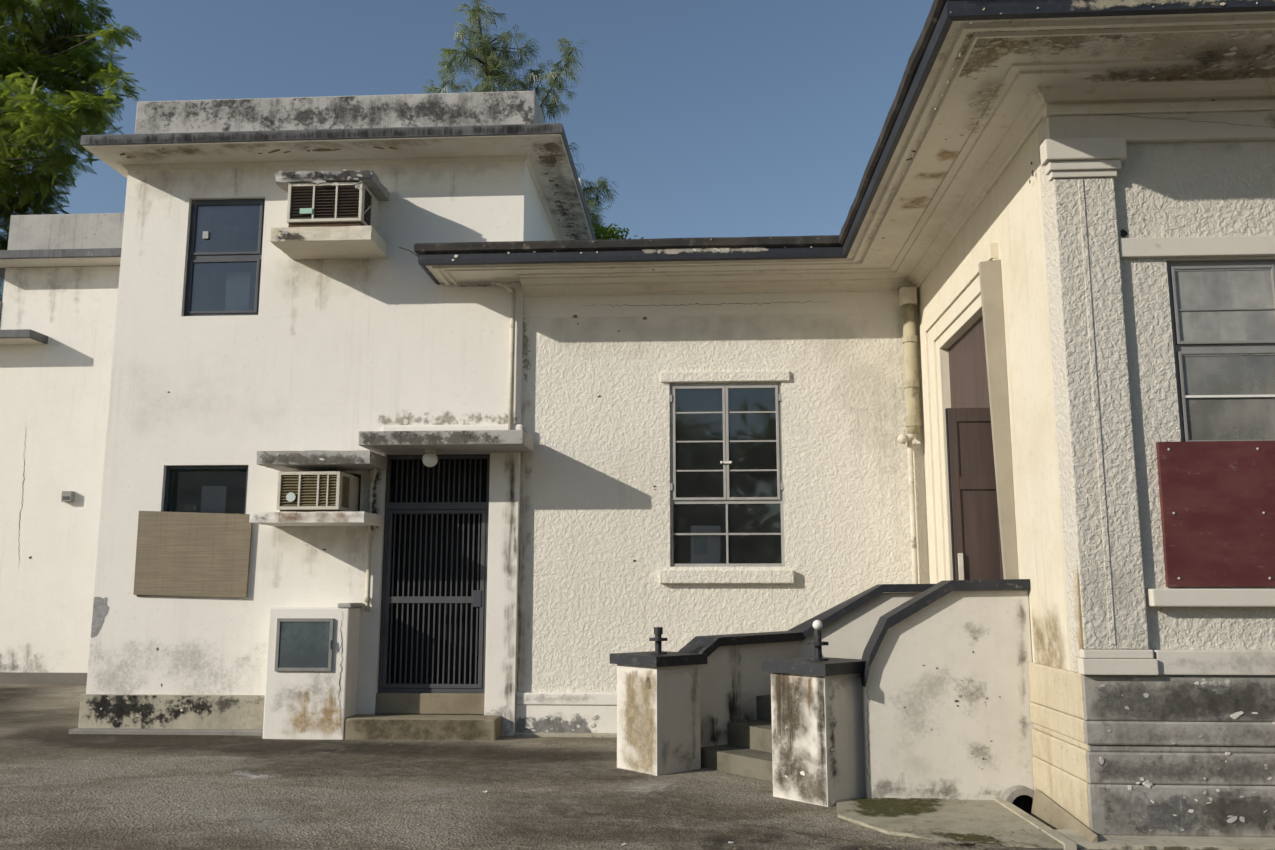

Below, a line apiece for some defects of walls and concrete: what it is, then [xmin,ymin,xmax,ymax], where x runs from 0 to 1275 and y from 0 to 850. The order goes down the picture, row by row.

damp [89,92,552,144]
damp [0,673,655,779]
mould [729,684,752,722]
mould [773,673,837,805]